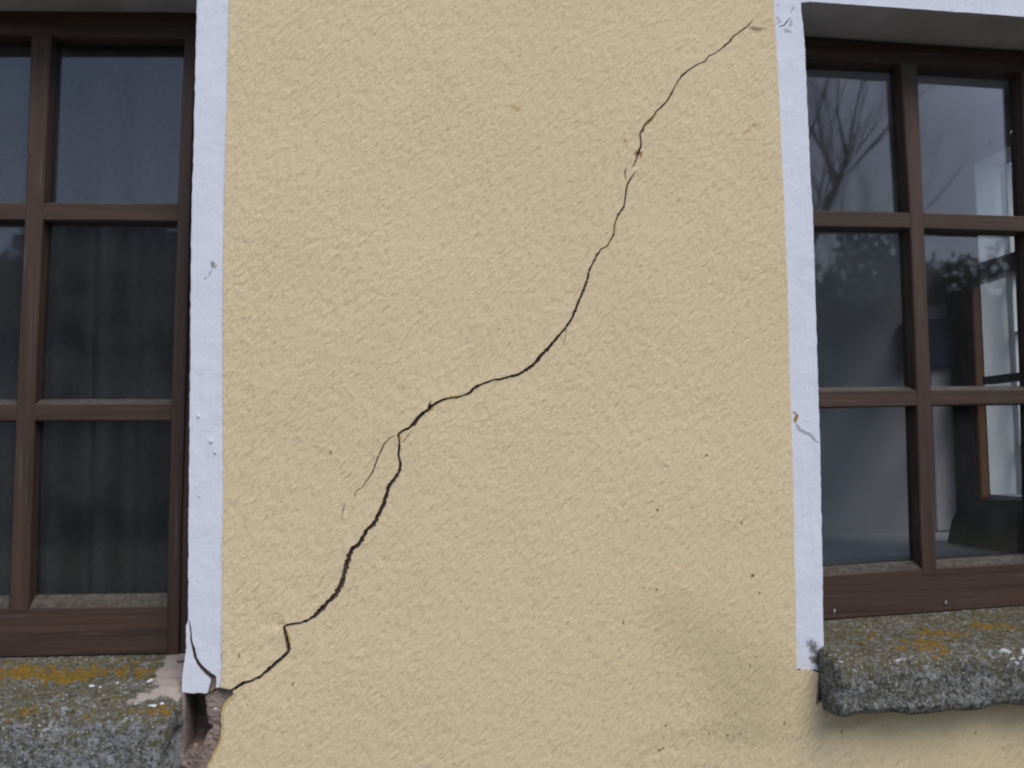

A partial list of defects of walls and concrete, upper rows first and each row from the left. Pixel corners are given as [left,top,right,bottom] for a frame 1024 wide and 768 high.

crack [189,18,790,694]
flaking render [174,670,236,768]